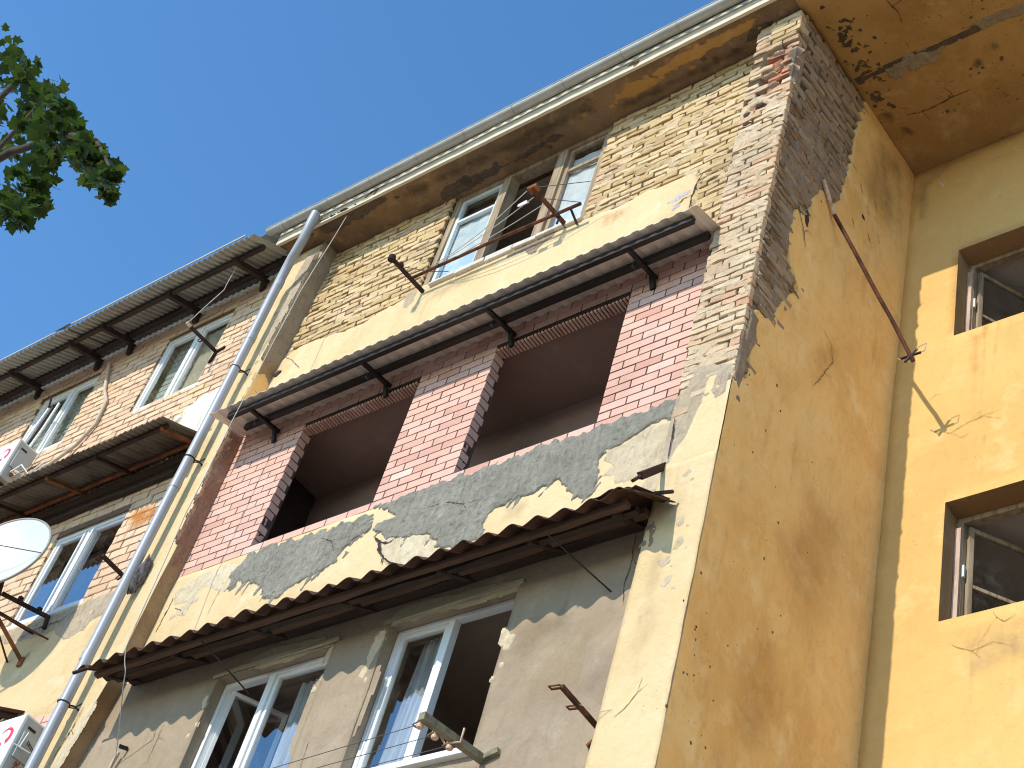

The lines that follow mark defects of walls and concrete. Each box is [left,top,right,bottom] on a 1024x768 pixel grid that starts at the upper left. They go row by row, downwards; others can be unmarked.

crack [908,89,969,118]
flaking render [704,5,896,402]
peeling [604,421,671,492]
spalling [171,426,244,567]
spalling [381,534,438,565]
peeling [169,564,239,621]
crack [953,612,1016,658]